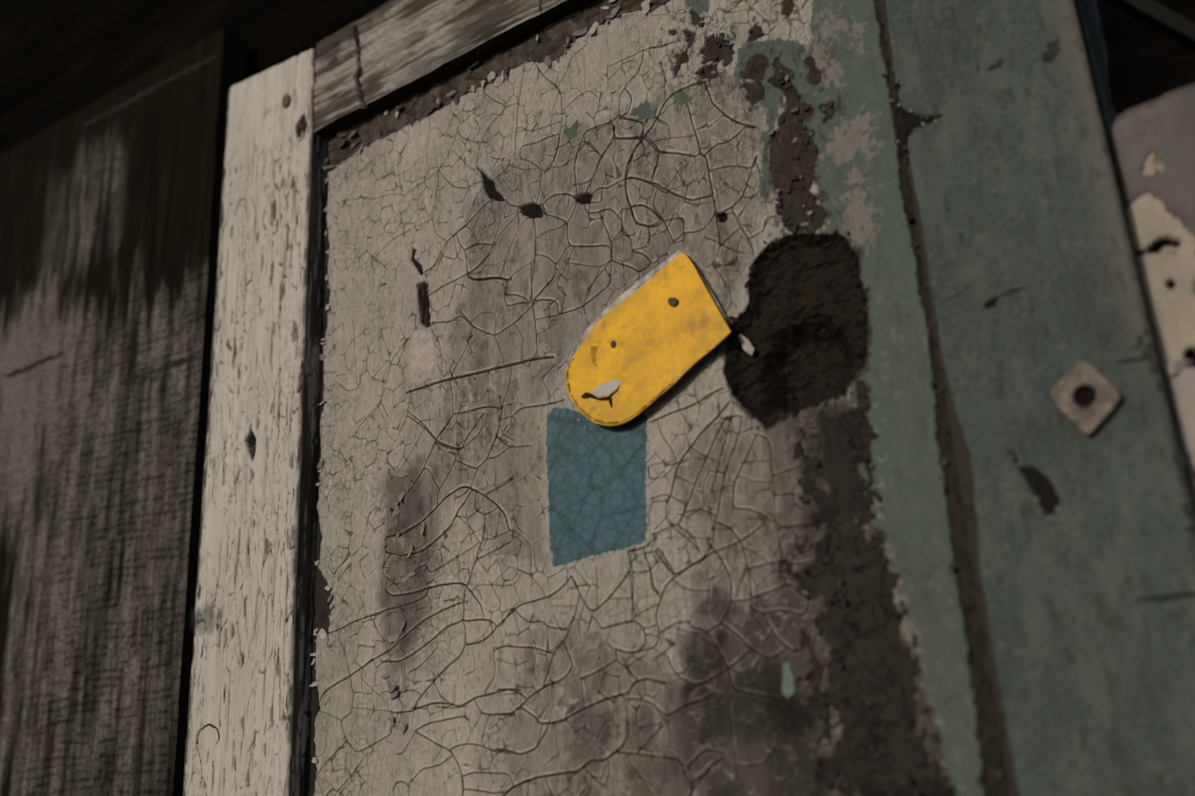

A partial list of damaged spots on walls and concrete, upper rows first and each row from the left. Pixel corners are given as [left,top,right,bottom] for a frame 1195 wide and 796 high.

peeling [293,110,308,147]
peeling [669,11,734,79]
peeling [748,26,764,42]
peeling [782,0,794,15]
peeling [742,56,838,234]
peeling [306,0,670,796]
crack [314,15,831,796]
peeling [738,334,755,356]
peeling [875,0,1017,796]
peeling [1010,455,1060,520]
peeling [1127,193,1195,393]
peeling [779,382,956,796]